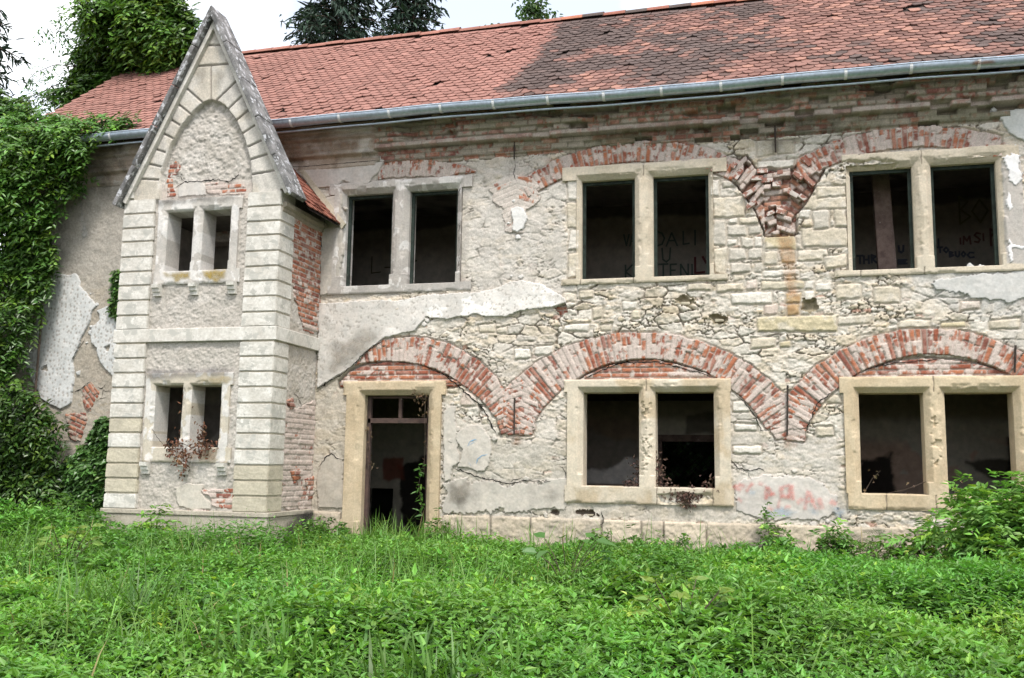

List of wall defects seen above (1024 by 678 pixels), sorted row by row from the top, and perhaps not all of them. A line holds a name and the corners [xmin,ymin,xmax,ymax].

peeling [990,107,1024,211]
peeling [166,161,246,199]
crack [177,174,239,187]
spalling [730,156,824,238]
spalling [675,293,697,309]
peeling [280,156,568,511]
peeling [25,273,116,442]
crack [456,467,567,484]
peeling [176,483,234,511]